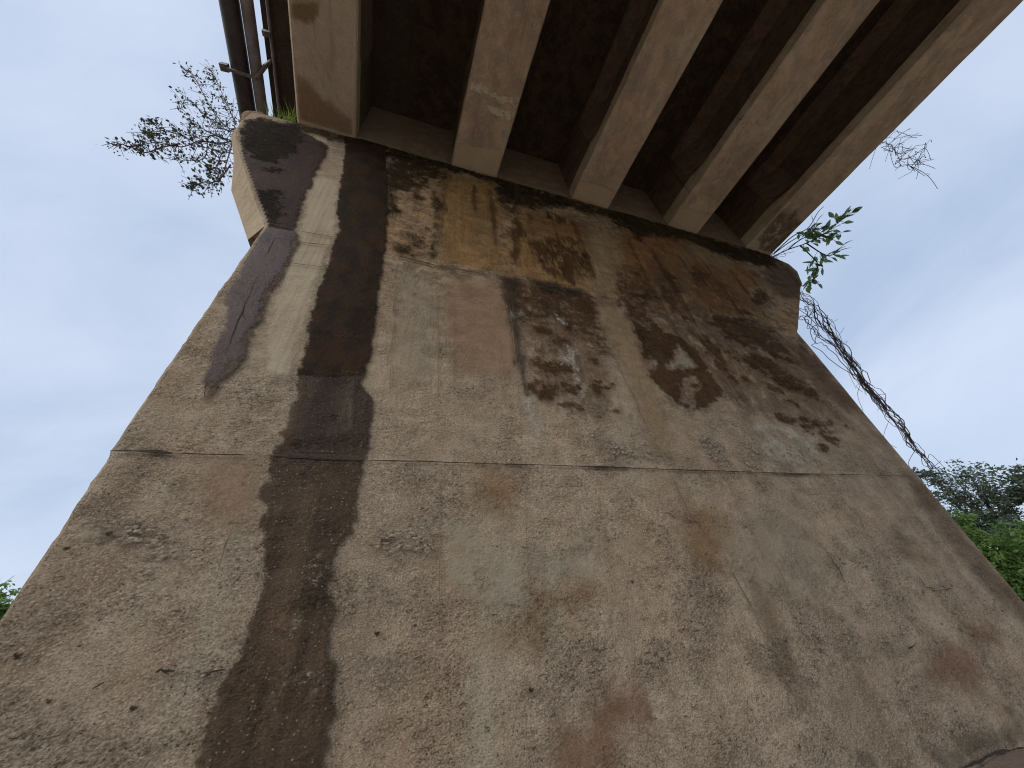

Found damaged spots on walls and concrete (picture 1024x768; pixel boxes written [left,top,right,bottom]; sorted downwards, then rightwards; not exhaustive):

water stain [191,117,798,768]
crack [110,254,897,718]
water stain [747,424,818,464]
water stain [799,347,854,406]